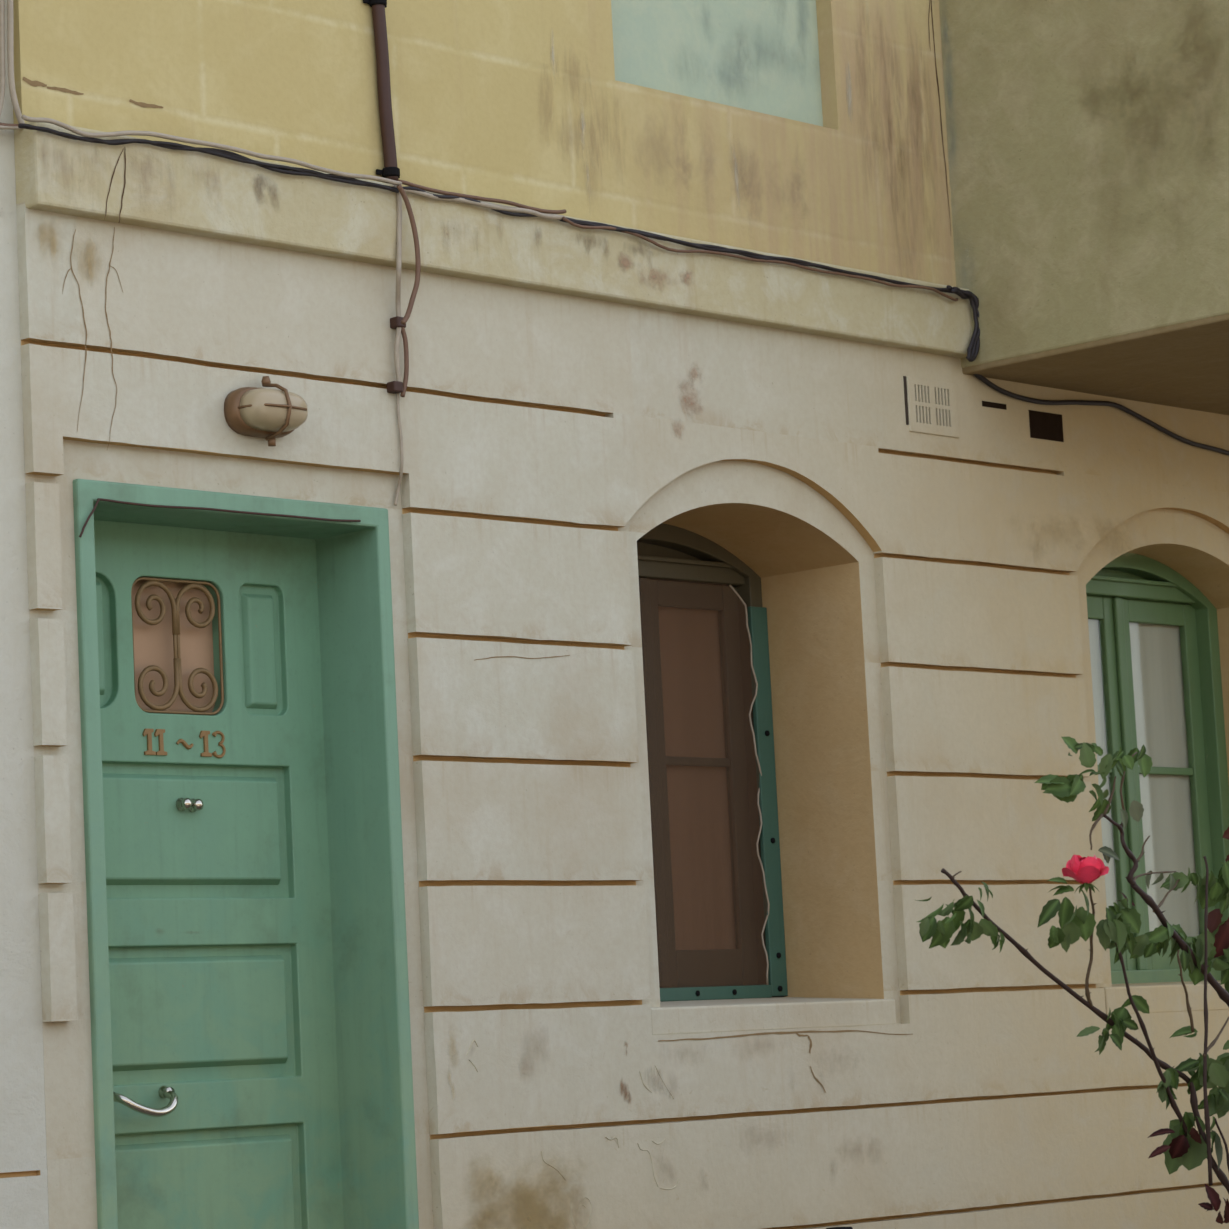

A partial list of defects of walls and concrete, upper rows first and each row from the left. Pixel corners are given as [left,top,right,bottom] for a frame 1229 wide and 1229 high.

crack [23,77,84,95]
crack [928,0,951,232]
crack [62,148,126,449]
crack [658,1030,911,1093]